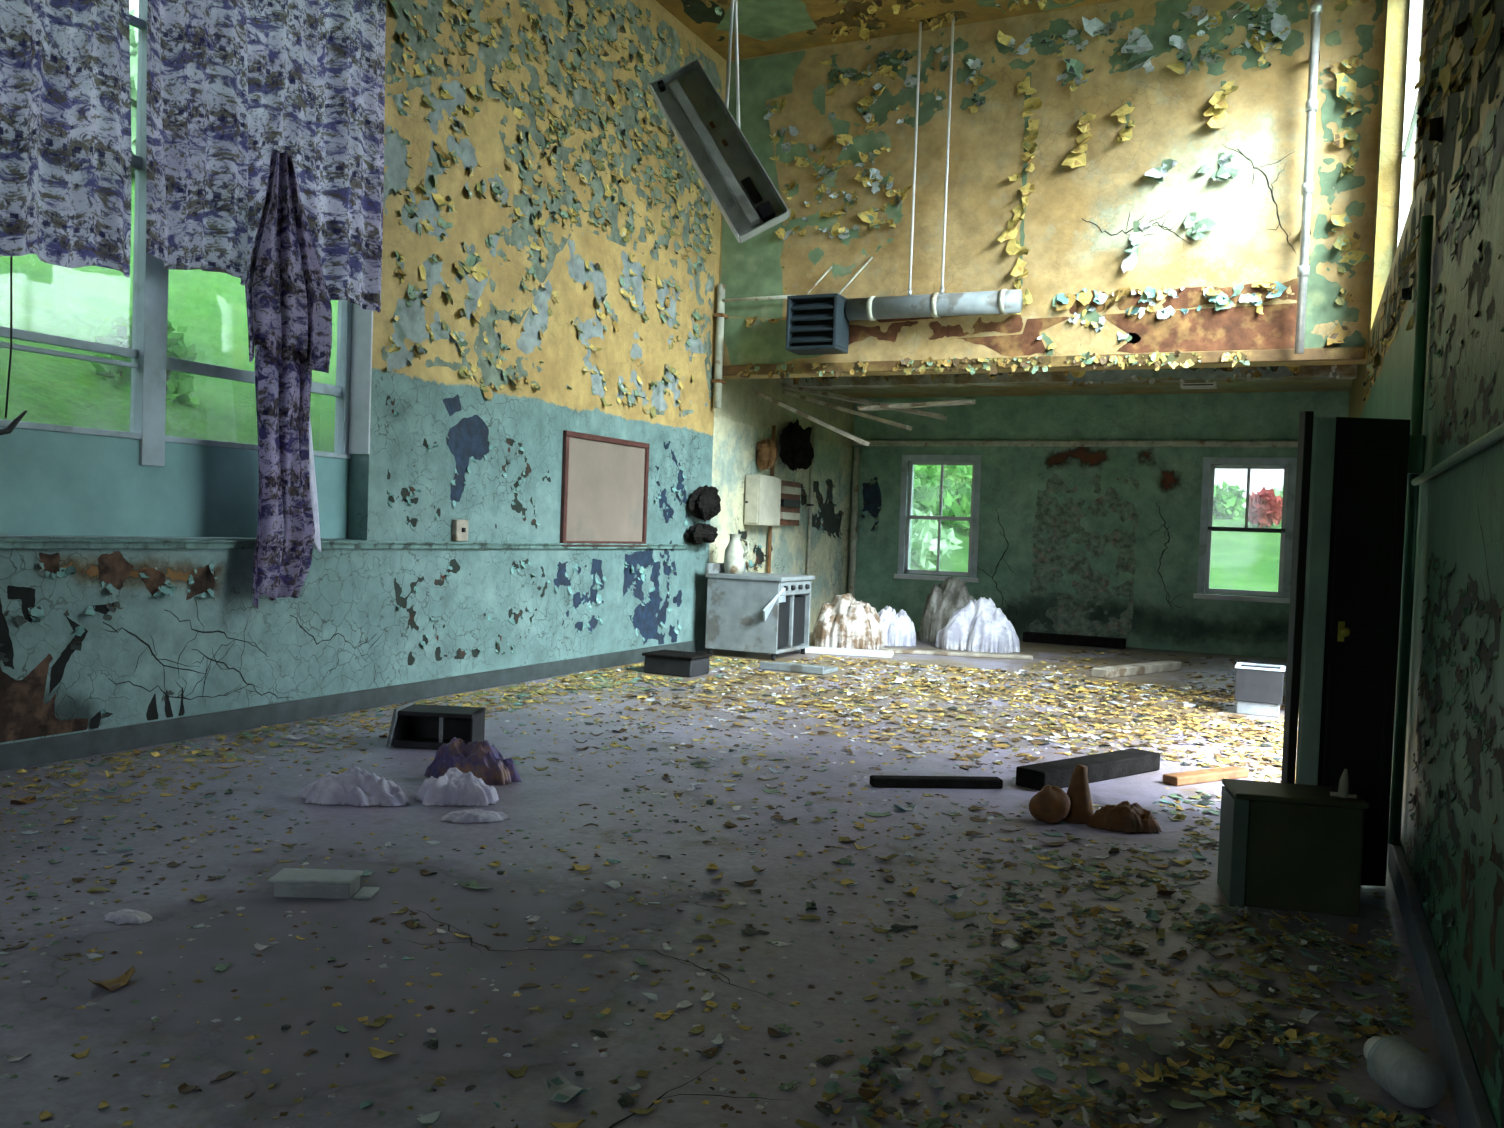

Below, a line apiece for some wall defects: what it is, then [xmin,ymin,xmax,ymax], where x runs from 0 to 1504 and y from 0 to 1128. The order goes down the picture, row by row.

peeling [382,0,1504,445]
peeling [387,394,551,530]
peeling [3,605,45,626]
spalling [0,643,113,743]
spalling [39,553,77,579]
spalling [64,551,219,651]
crack [100,584,384,706]
peeling [394,441,690,666]
peeling [1405,551,1504,1128]
crack [609,1066,779,1128]